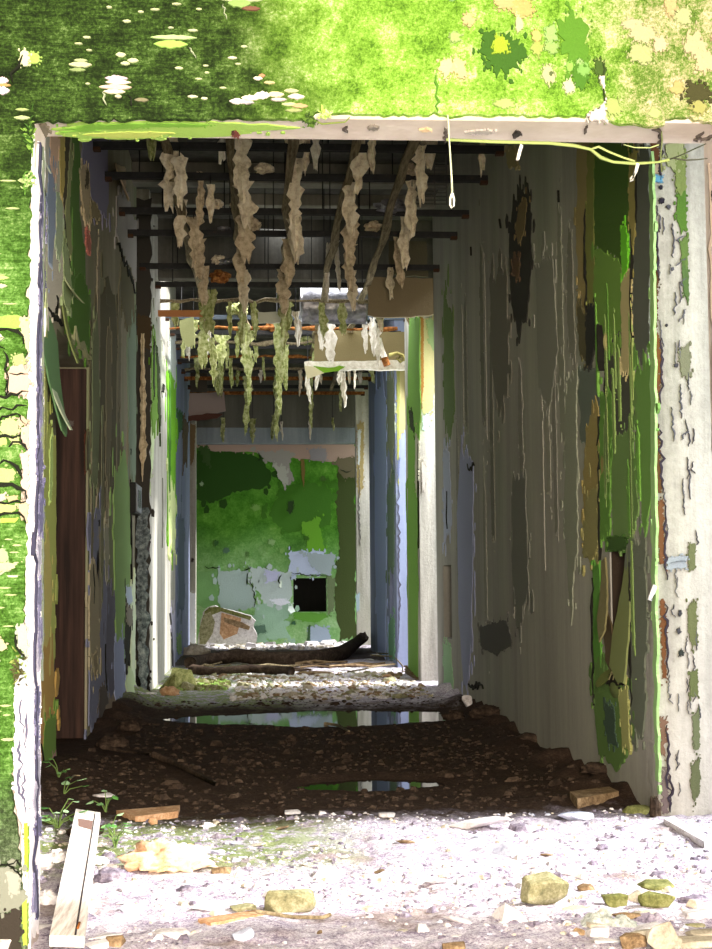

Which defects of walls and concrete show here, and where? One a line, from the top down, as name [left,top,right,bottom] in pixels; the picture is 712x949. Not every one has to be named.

flaking render [156,333,177,447]
peeling [182,413,362,644]
peeling [386,371,396,482]
leakage [373,142,662,794]
rust [655,230,663,403]
rust [657,424,668,571]
rust [659,599,668,686]